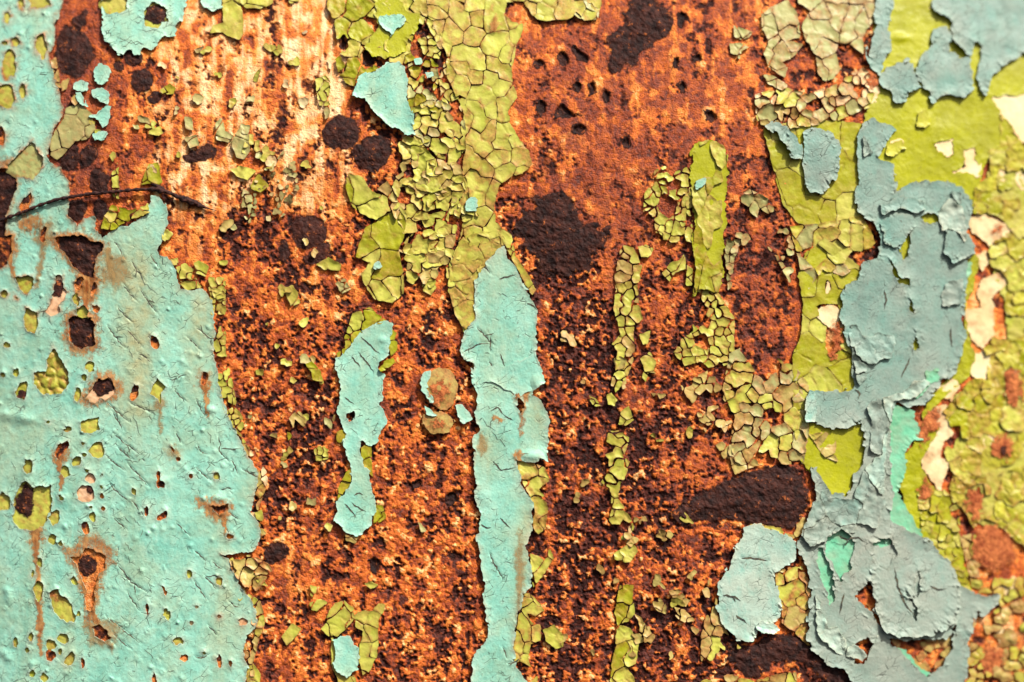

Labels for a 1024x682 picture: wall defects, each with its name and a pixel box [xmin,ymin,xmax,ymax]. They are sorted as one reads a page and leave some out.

peeling [215,118,311,232]
rust [0,144,129,356]
peeling [0,0,273,682]
crack [101,242,179,362]
crack [106,375,260,672]
rust [420,367,472,434]
peeling [298,0,602,682]
crack [464,267,535,366]
crack [483,407,529,471]
rust [670,463,810,530]
peeling [643,0,1024,682]
rust [725,628,850,682]